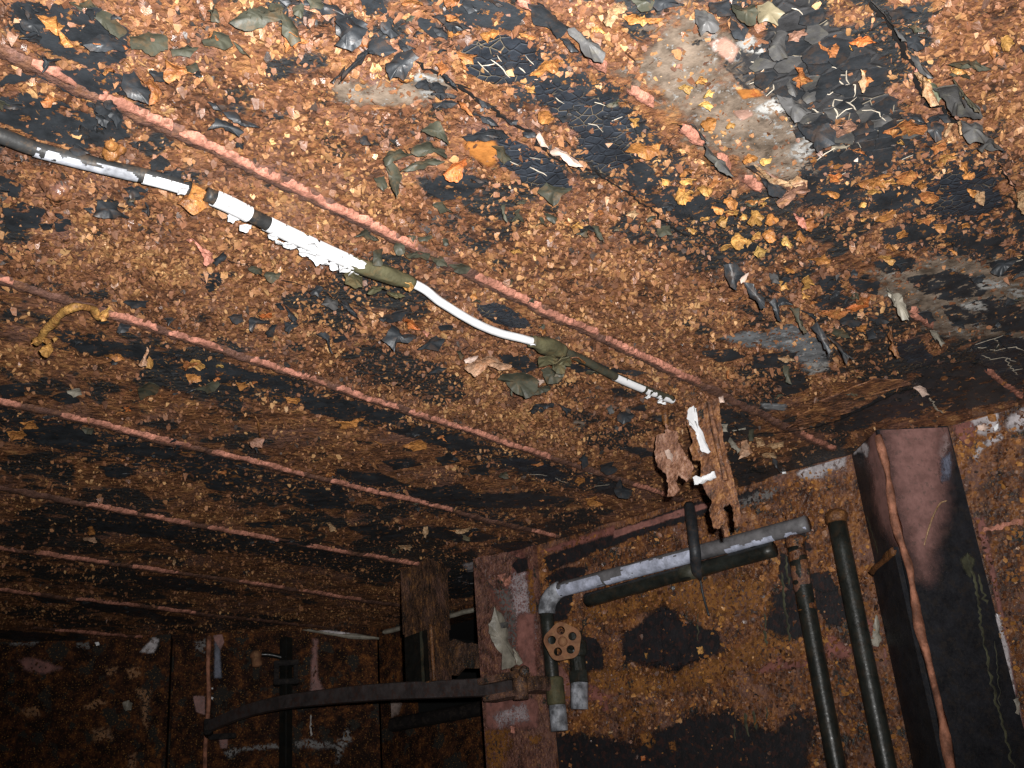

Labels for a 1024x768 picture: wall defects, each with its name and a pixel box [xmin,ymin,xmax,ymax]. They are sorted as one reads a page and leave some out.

crack [813,67,886,159]
corrosion [102,139,127,162]
crack [416,55,689,237]
corrosion [46,183,73,206]
corrosion [177,180,212,215]
peeling [0,0,1024,487]
corrosion [30,302,110,358]
corrosion [138,347,153,369]
corrosion [249,416,265,453]
peeling [0,323,655,554]
leakage [940,409,1024,481]